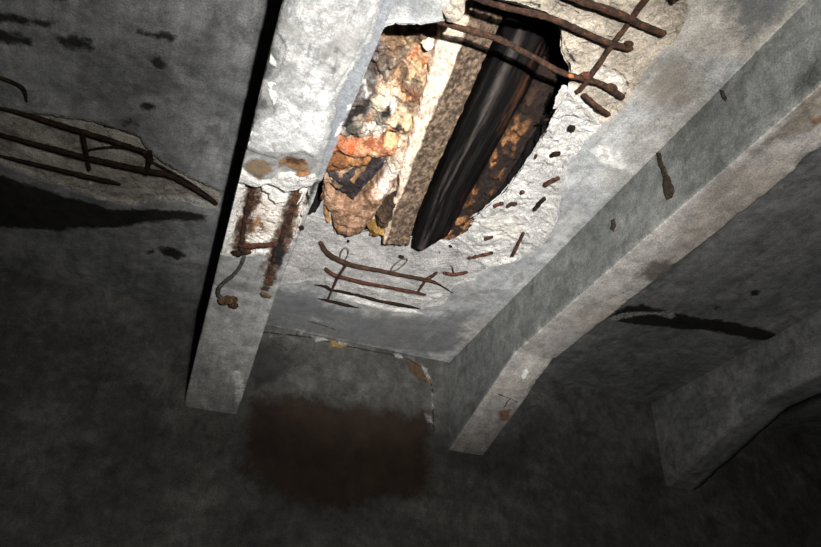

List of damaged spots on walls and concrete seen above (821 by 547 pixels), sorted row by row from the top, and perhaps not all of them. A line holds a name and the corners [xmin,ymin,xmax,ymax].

spalling [0,110,224,208]
rust [246,157,309,177]
spalling [221,0,689,314]
rust [233,186,264,250]
rust [261,181,320,291]